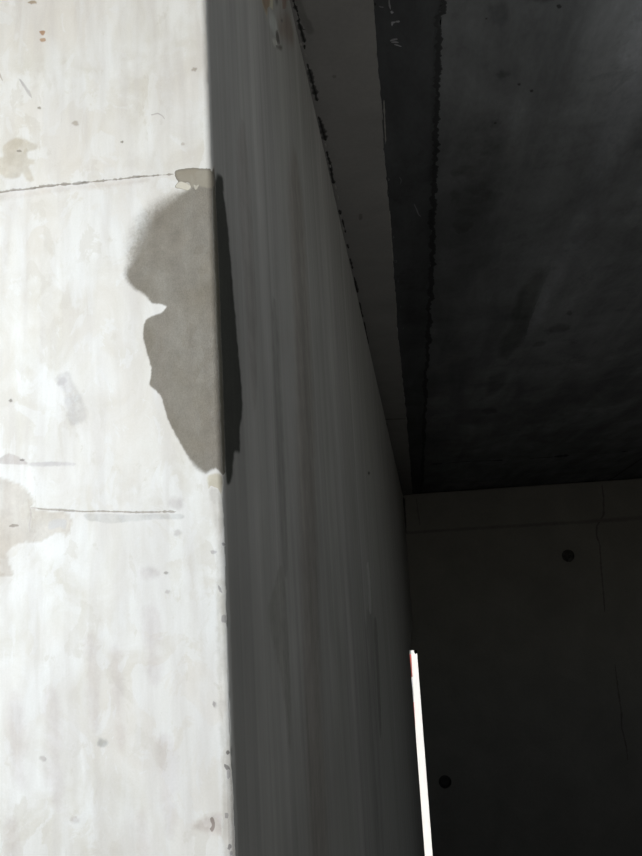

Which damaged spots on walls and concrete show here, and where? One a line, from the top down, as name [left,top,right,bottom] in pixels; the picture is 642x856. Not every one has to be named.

crack [0,173,173,203]
crack [29,506,185,525]